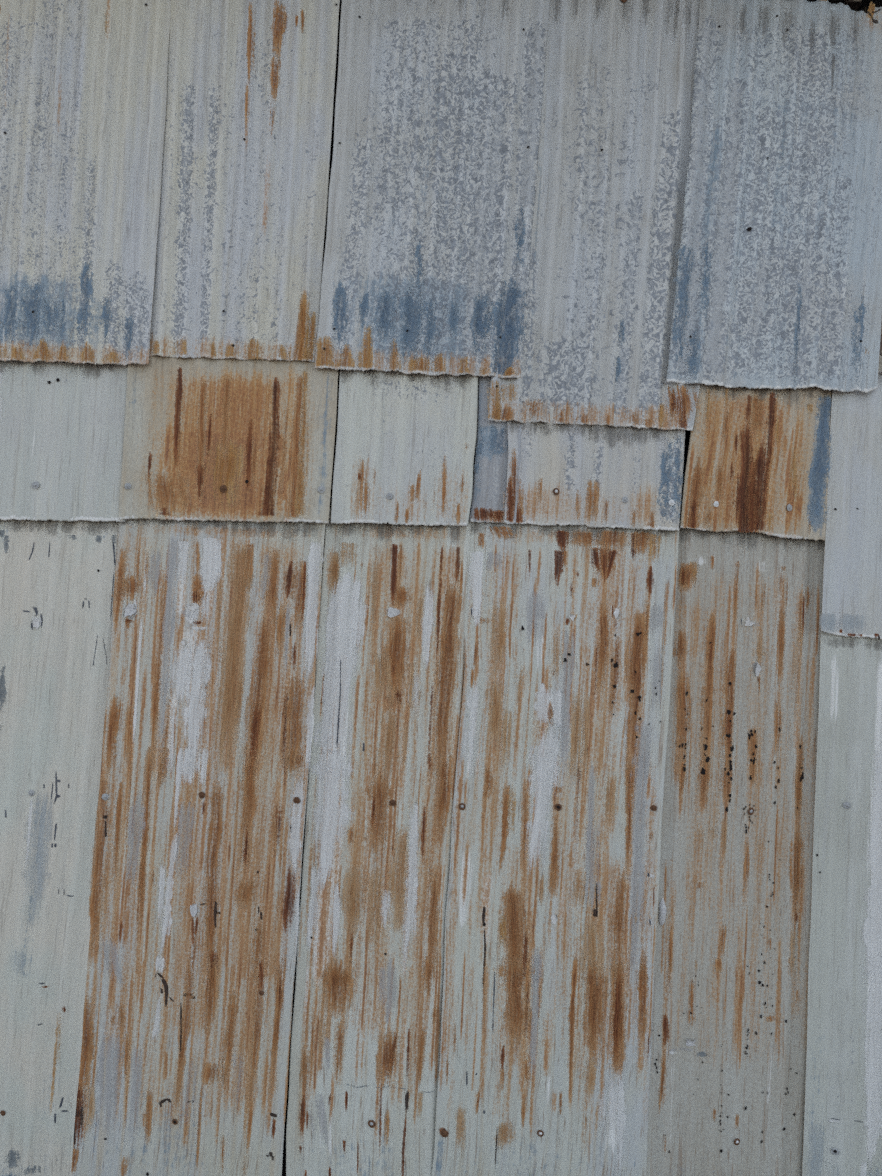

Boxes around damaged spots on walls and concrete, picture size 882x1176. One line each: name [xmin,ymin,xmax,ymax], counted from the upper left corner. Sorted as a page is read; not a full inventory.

rust [269,0,305,135]
rust [146,294,373,518]
rust [685,388,779,533]
leakage [5,1150,41,1176]
rust [71,997,95,1172]
rust [89,619,169,957]
rust [176,782,238,1165]
rust [246,919,285,1148]
rust [298,543,512,1176]
rust [484,768,527,872]
rust [554,481,661,1114]
rust [673,613,736,859]